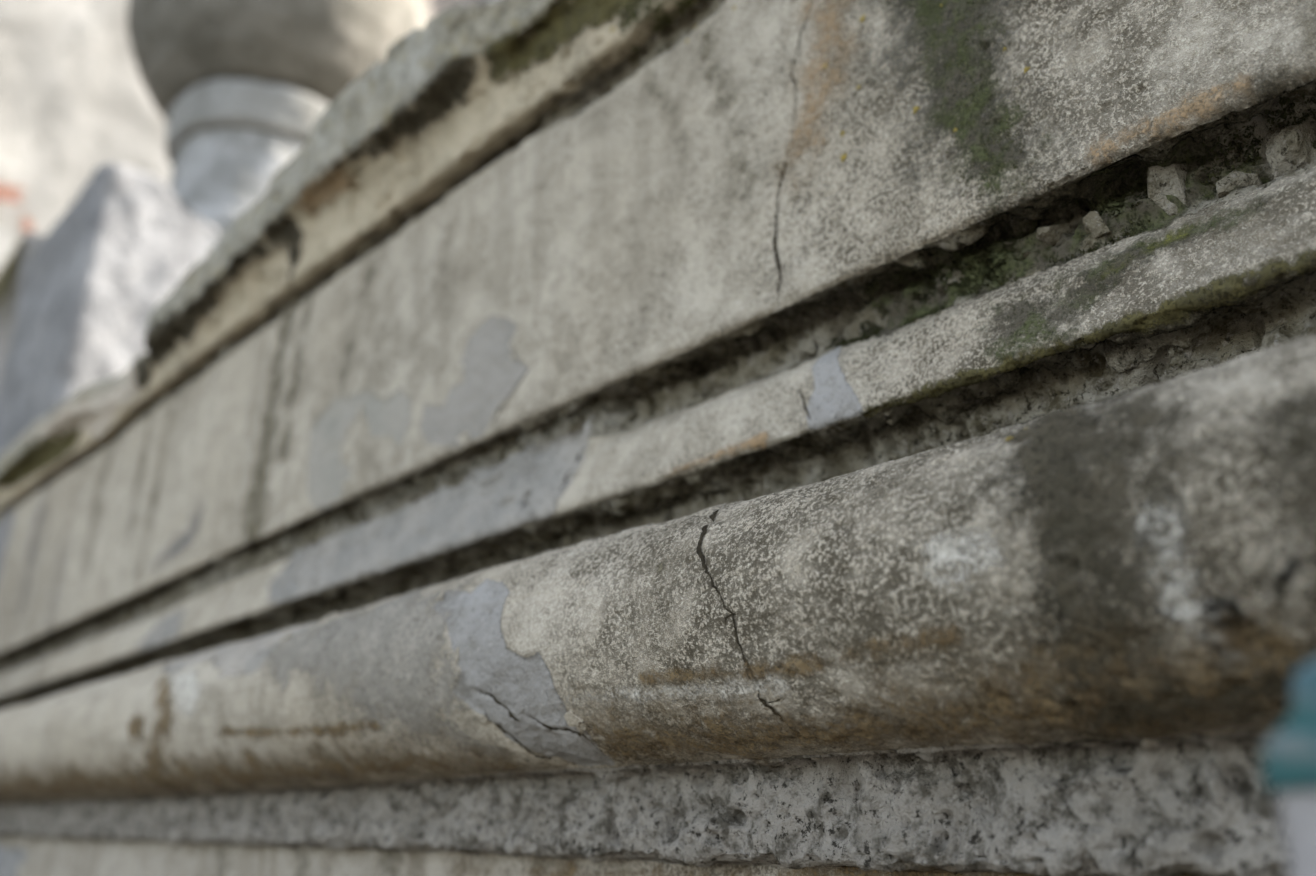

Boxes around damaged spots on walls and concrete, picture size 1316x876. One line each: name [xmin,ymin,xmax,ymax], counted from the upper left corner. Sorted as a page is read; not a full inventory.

leakage [331,56,477,168]
crack [773,1,813,305]
leakage [540,0,1311,438]
peeling [307,315,529,511]
spalling [434,578,615,767]
crack [696,505,795,731]